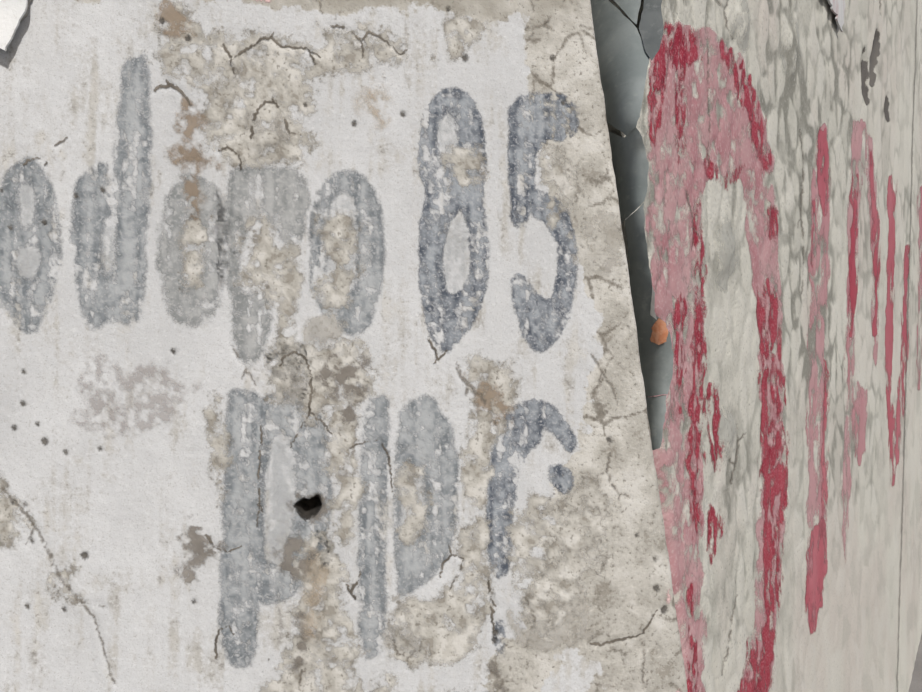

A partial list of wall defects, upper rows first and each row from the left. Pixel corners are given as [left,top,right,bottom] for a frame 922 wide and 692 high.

peeling [0,0,33,51]
crack [154,79,192,106]
crack [222,32,321,74]
spalling [861,29,880,105]
crack [218,96,301,170]
peeling [590,0,674,450]
peeling [235,213,398,692]
peeling [385,354,519,669]
crack [1,487,114,681]